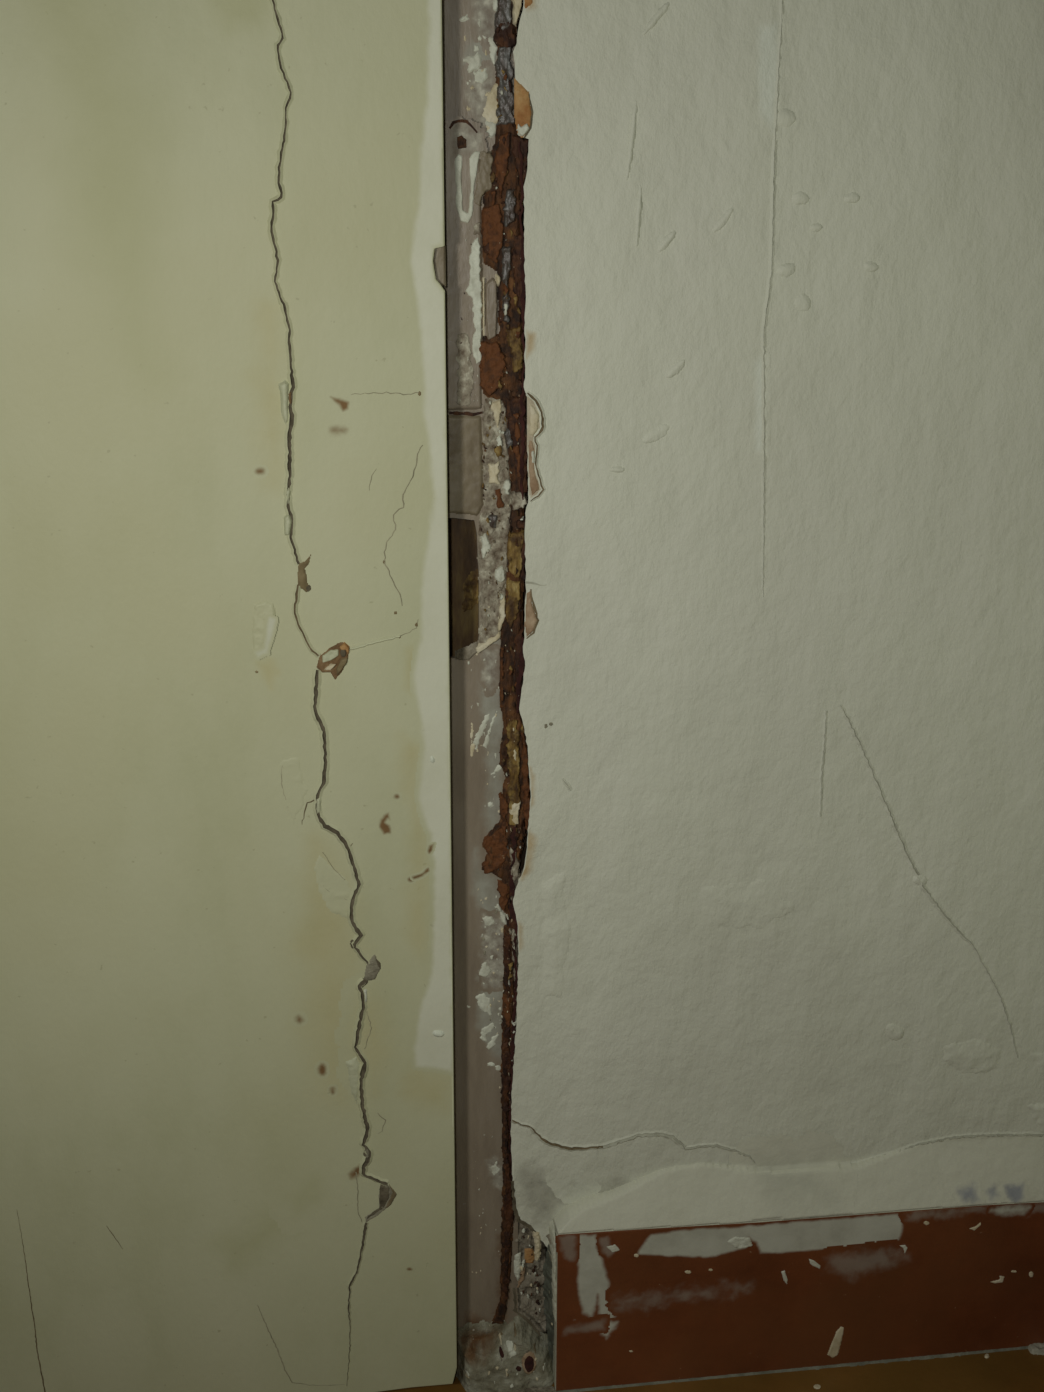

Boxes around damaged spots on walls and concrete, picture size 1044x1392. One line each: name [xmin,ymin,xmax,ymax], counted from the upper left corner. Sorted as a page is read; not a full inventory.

crack [257,0,423,1386]
corrosion [455,0,531,1377]
peeling [445,0,546,1088]
flaking render [475,1136,547,1333]
crack [511,1118,756,1164]